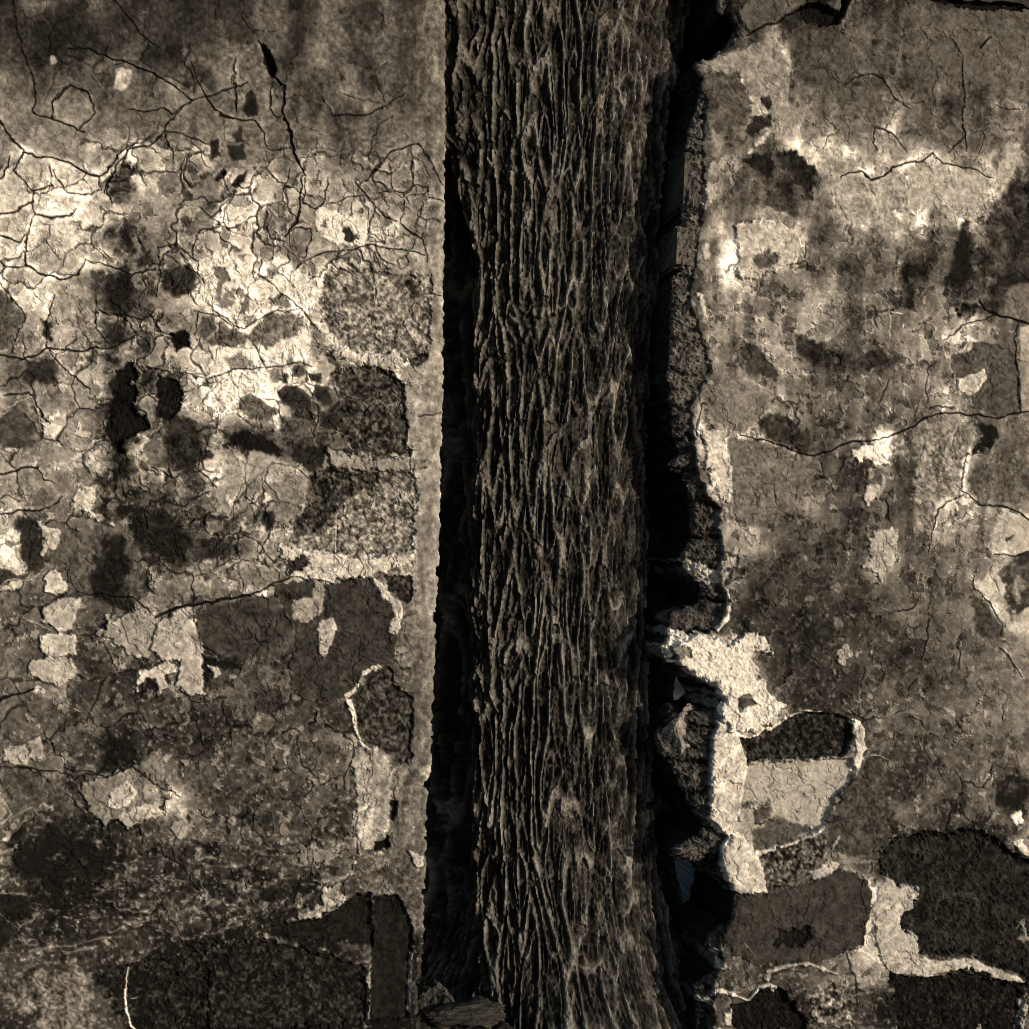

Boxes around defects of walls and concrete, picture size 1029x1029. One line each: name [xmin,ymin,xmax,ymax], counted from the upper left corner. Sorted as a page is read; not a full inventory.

crack [1,38,444,299]
crack [855,121,989,182]
leakage [943,166,1029,321]
leakage [89,220,148,598]
peeling [701,428,733,503]
crack [751,310,1029,456]
crack [106,580,284,658]
spalling [273,266,436,857]
leakage [1000,551,1029,614]
peeling [409,850,425,868]
spalling [661,553,1029,1029]
spalling [94,882,414,1029]